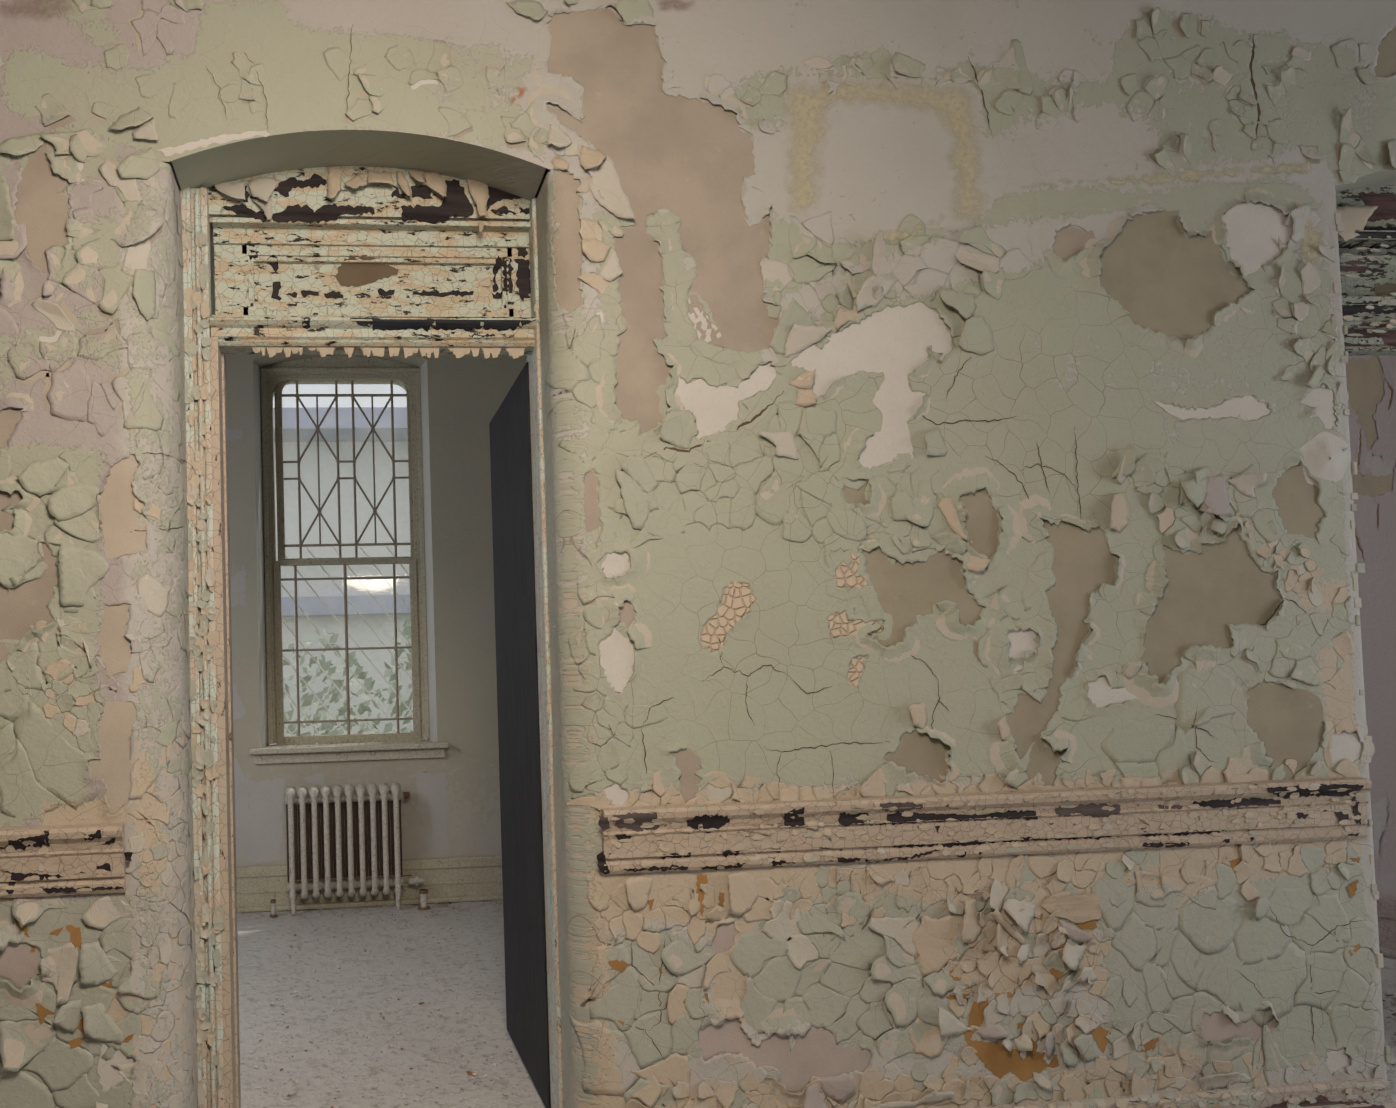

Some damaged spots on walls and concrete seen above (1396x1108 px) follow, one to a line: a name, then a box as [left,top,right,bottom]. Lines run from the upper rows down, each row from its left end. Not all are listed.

peeling [218,50,269,114]
peeling [323,47,390,124]
peeling [384,40,474,139]
peeling [213,167,529,232]
peeling [250,248,538,359]
flaking render [501,0,1396,1108]
crack [641,697,673,793]
crack [703,639,875,793]
crack [911,655,949,729]
peeling [416,771,449,851]